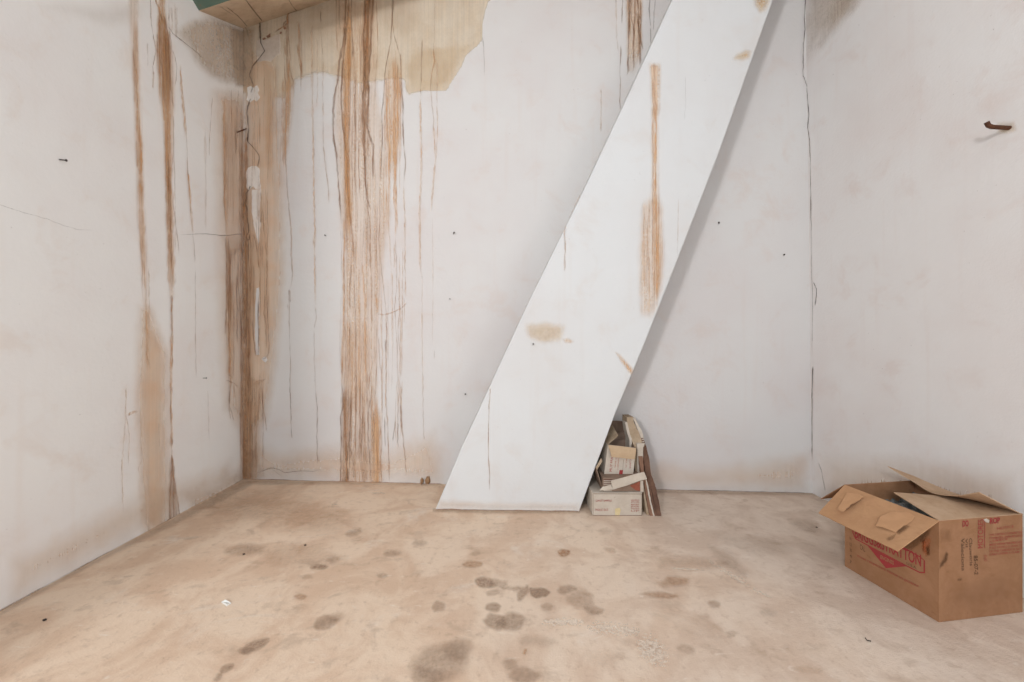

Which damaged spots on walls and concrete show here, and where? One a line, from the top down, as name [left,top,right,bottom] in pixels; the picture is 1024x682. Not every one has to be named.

rust [153,22,181,195]
crack [212,2,297,257]
water stain [243,0,490,96]
rust [332,0,406,207]
rust [620,0,650,66]
rust [225,32,302,480]
rust [142,318,179,528]
rust [340,391,404,483]
water stain [530,588,549,598]